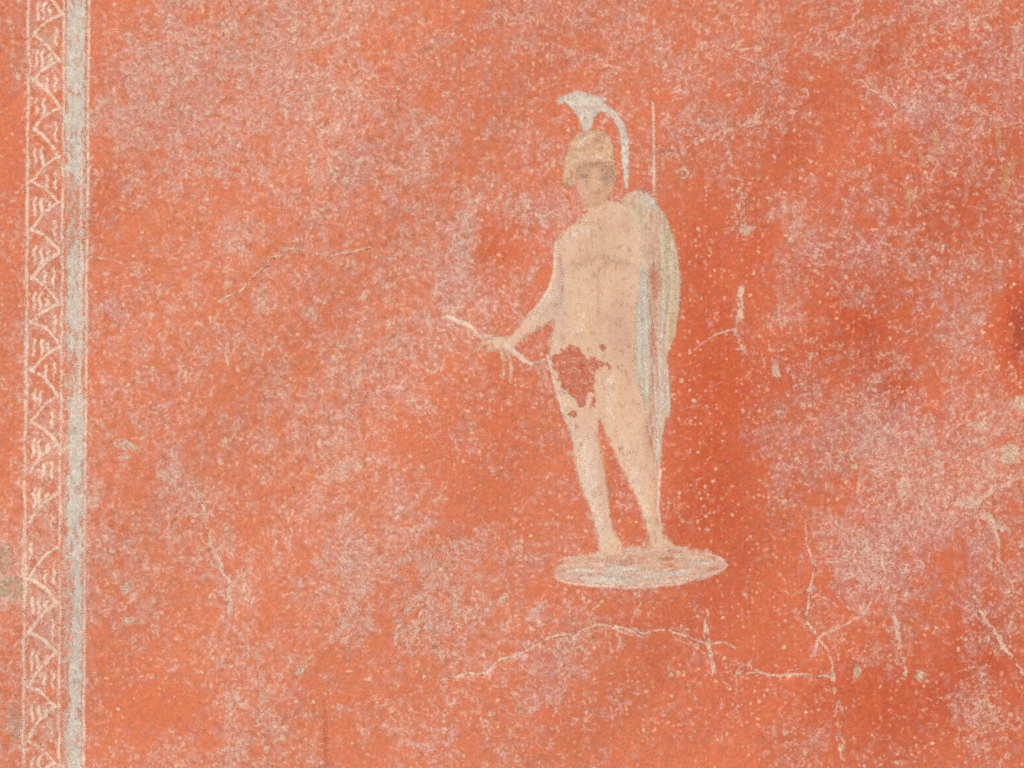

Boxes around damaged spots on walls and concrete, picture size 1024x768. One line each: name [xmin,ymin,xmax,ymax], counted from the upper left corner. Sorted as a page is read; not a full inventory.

crack [218,247,397,303]
crack [438,515,872,685]